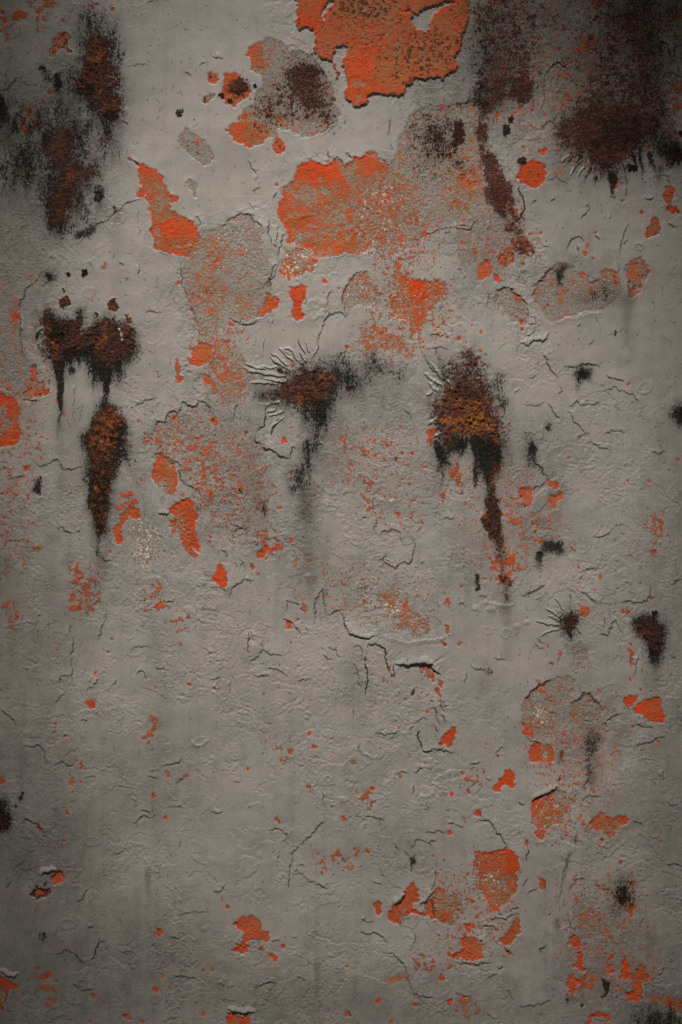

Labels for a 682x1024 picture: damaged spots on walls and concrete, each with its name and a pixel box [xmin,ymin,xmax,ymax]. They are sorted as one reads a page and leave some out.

rust [0,4,125,239]
rust [218,50,346,135]
peeling [203,0,469,155]
rust [402,0,682,256]
rust [36,264,141,557]
rust [243,337,407,512]
peeling [108,101,650,648]
rust [424,347,512,600]
crack [285,577,585,1007]
peeling [623,643,665,728]
peeling [233,916,285,961]
peeling [373,847,523,985]